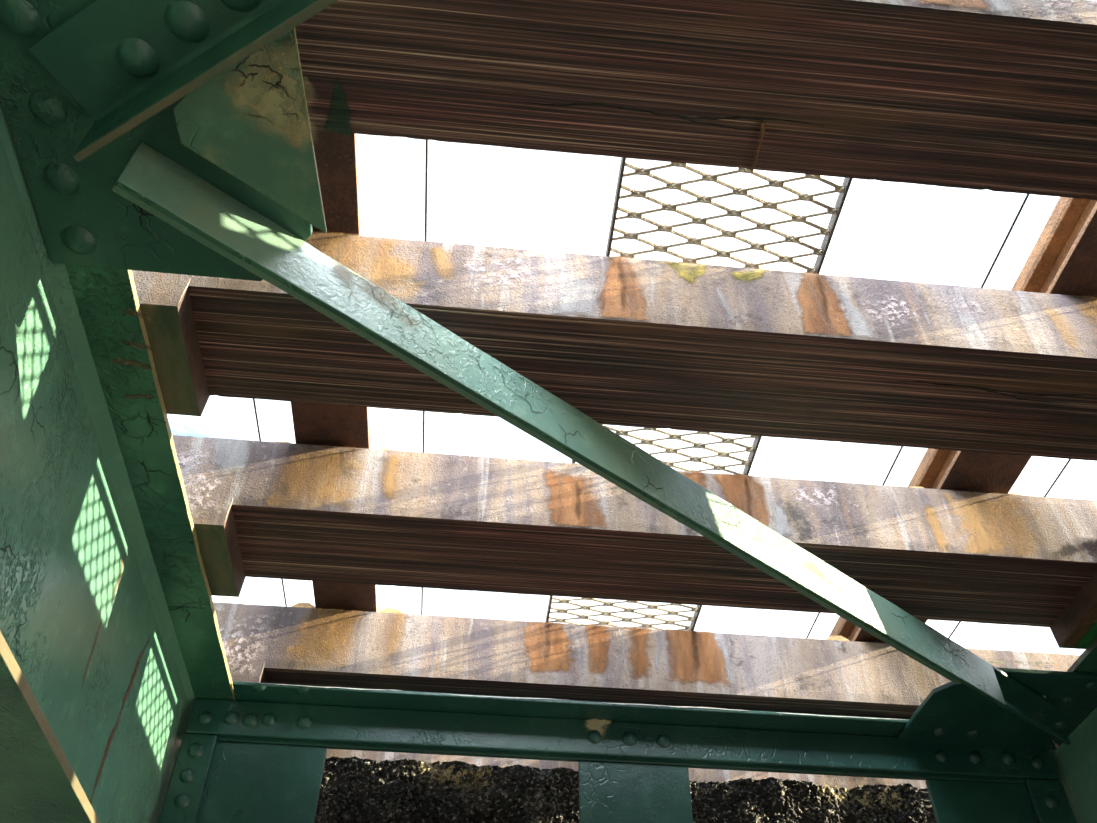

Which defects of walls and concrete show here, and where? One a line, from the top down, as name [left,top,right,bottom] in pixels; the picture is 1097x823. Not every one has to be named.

corrosion [919,0,988,8]
crack [231,56,299,145]
corrosion [599,255,647,320]
corrosion [797,273,851,335]
crack [470,355,586,443]
corrosion [524,621,572,671]
corrosion [586,624,610,673]
corrosion [631,627,650,677]
corrosion [666,629,729,684]
corrosion [90,640,149,804]
peeling [587,719,611,735]